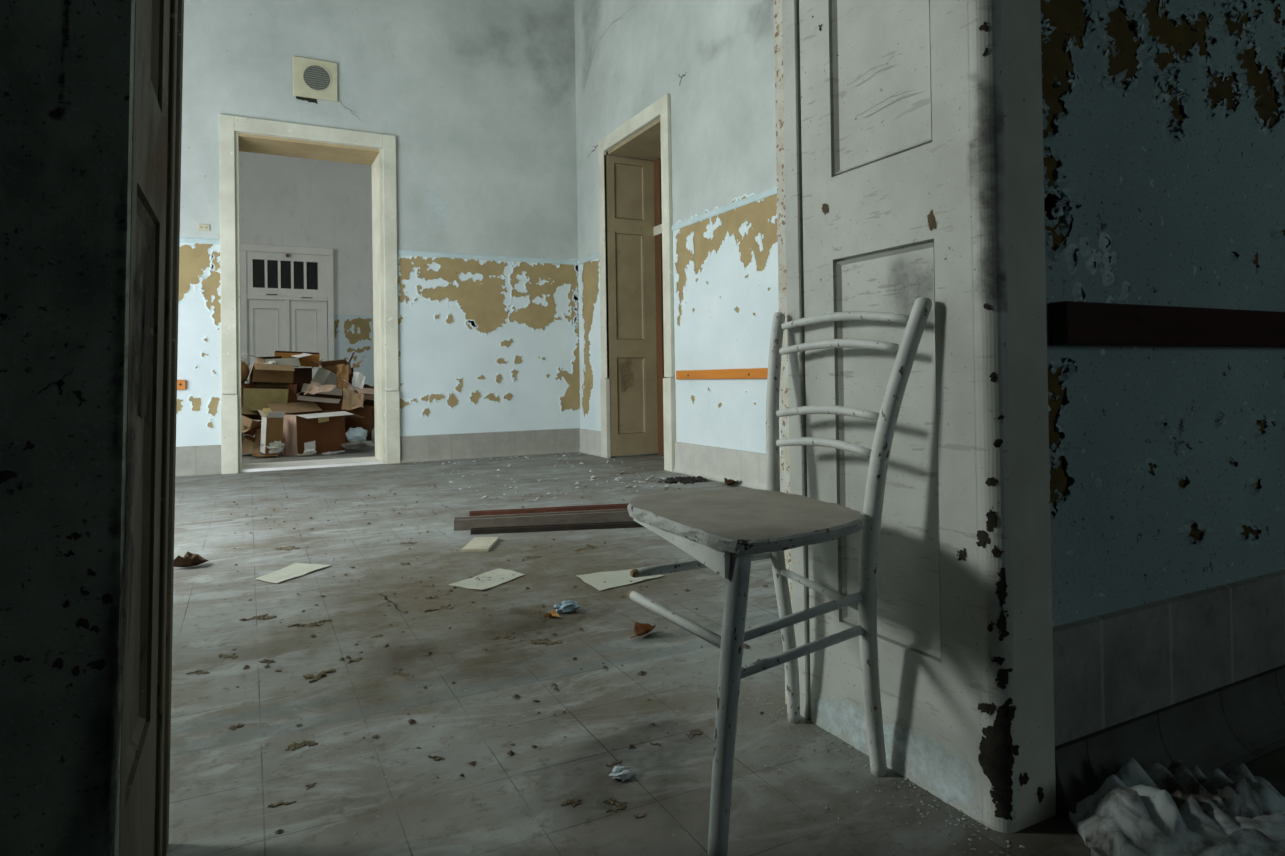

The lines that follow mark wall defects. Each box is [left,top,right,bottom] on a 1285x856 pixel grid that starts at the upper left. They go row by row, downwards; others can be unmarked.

peeling [1040,0,1285,304]
peeling [179,242,221,376]
peeling [334,317,373,369]
peeling [397,256,600,418]
peeling [675,193,778,328]
peeling [957,509,1044,820]